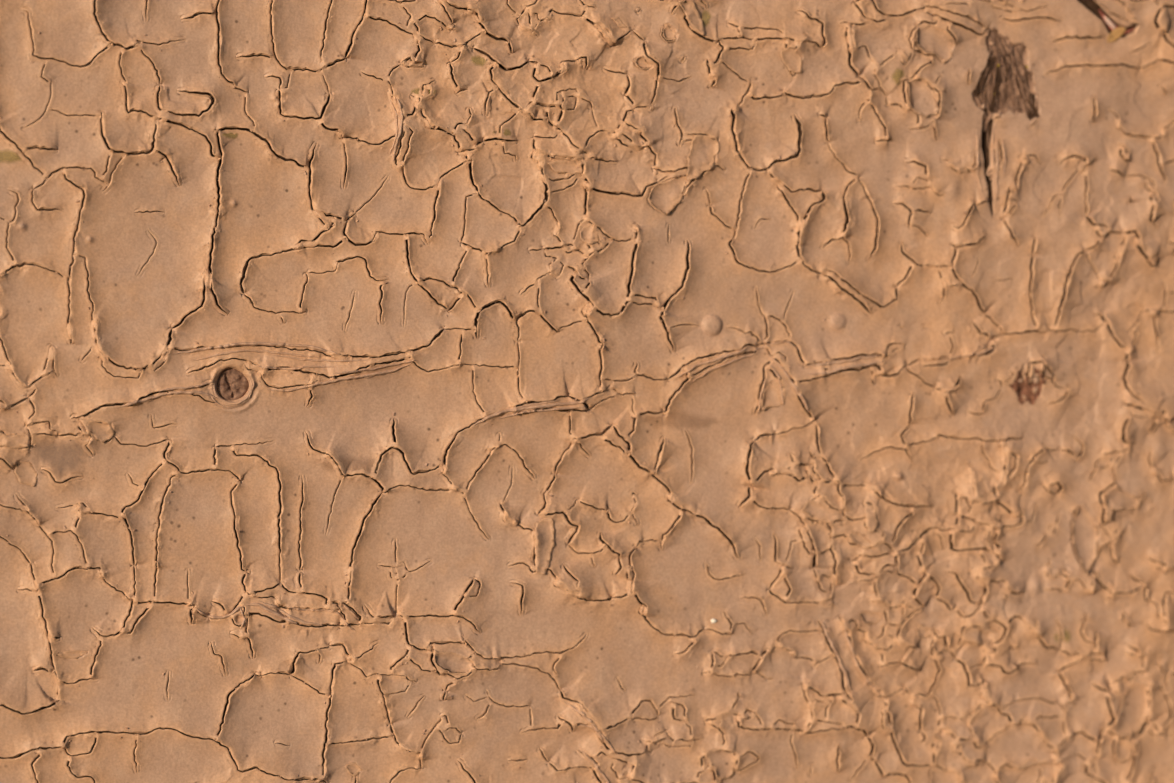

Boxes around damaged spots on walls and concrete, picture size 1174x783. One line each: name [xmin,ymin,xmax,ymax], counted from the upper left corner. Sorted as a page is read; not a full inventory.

crack [0,0,131,131]
crack [142,0,152,22]
peeling [852,0,1041,131]
peeling [1093,0,1174,69]
crack [134,207,165,278]
crack [169,339,353,408]
crack [236,0,1174,783]
crack [163,670,173,701]
crack [27,748,101,783]
crack [130,734,142,774]